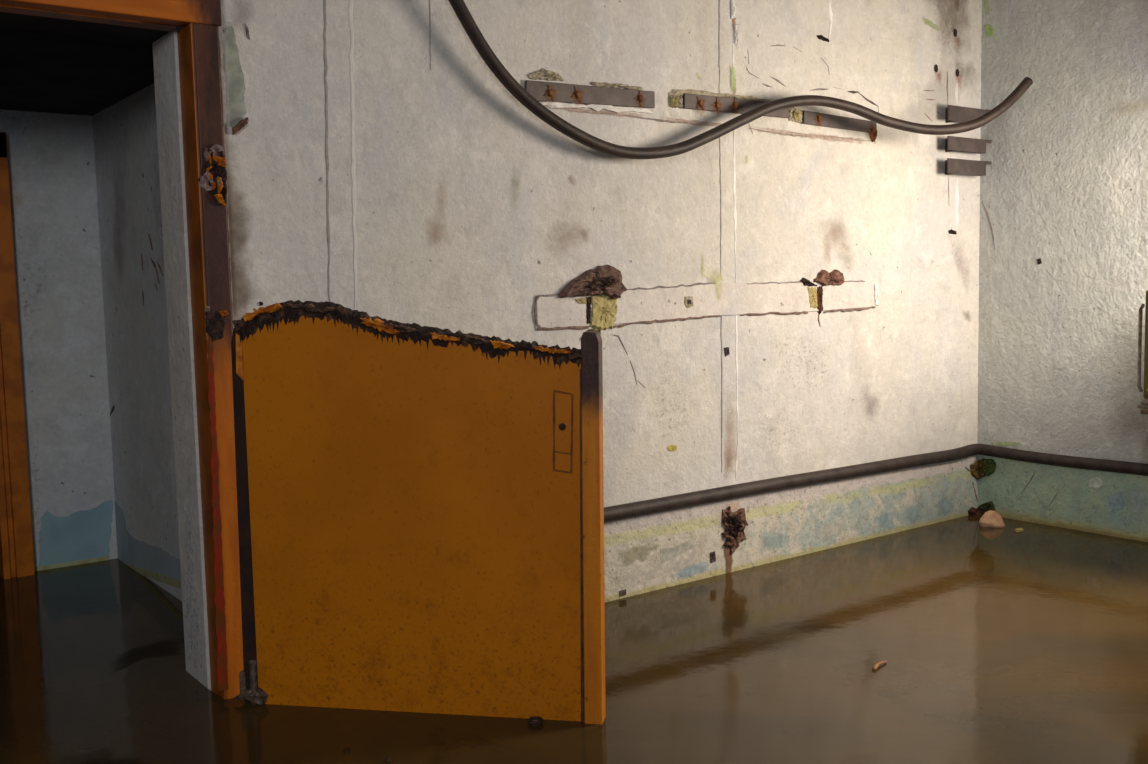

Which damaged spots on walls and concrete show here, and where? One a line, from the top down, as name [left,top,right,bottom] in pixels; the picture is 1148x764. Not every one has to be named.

peeling [225,22,250,135]
corrosion [539,85,654,117]
corrosion [672,79,741,126]
corrosion [772,112,877,143]
spalling [197,144,227,206]
spalling [558,265,627,334]
spalling [799,269,845,327]